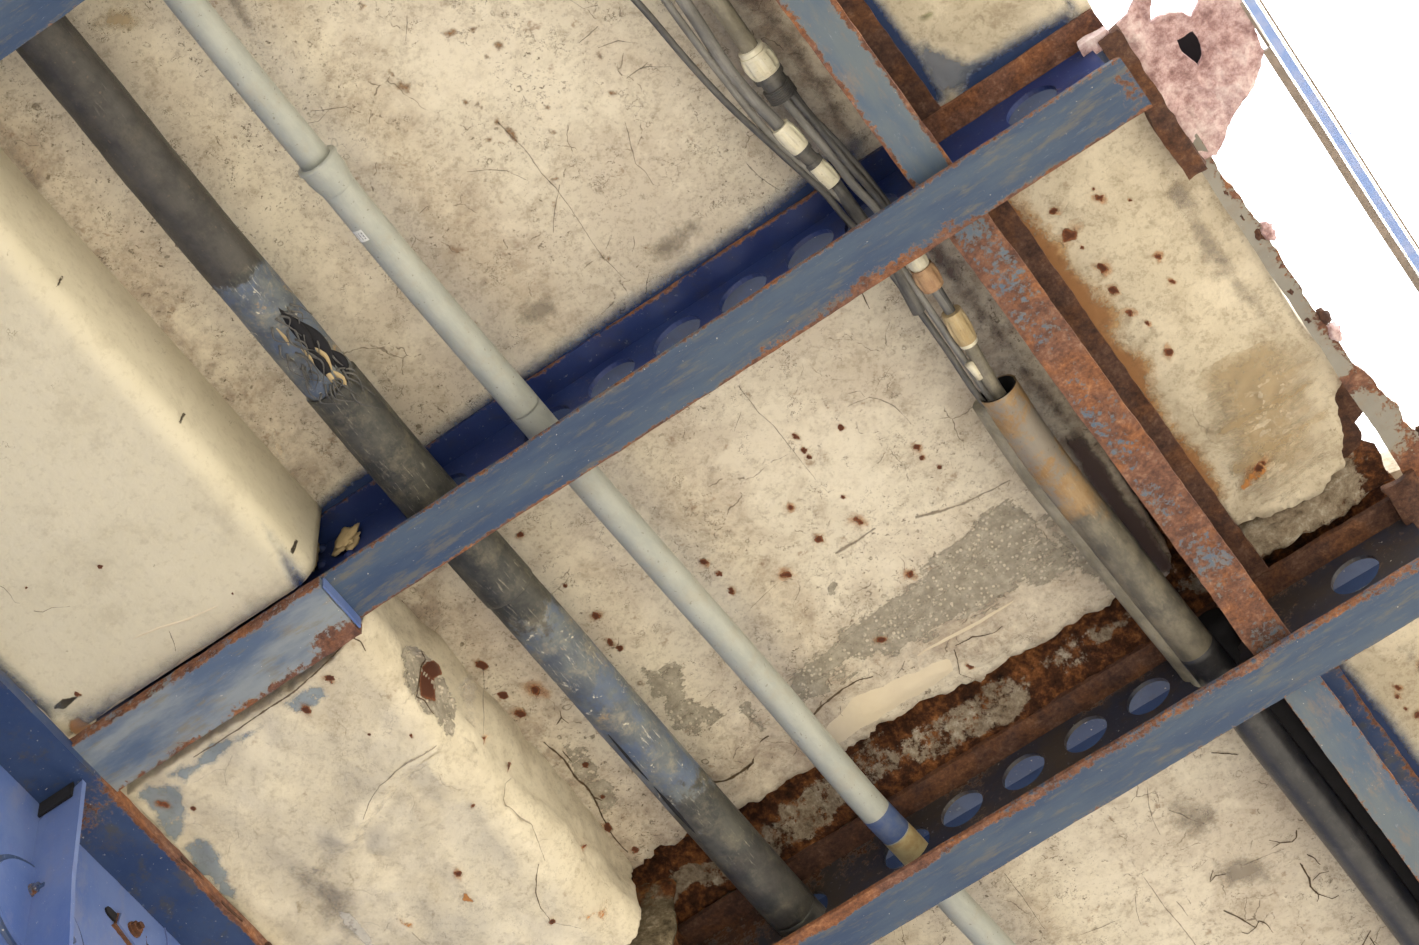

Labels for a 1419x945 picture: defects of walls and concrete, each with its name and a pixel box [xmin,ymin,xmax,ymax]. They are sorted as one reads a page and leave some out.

rust [1008,196,1222,497]
rust [1067,437,1175,572]
rust [1241,459,1266,490]
spalling [1238,440,1395,567]
spalling [1138,497,1214,613]
spalling [401,646,457,736]
rust [497,692,526,718]
rust [526,684,546,696]
peeling [641,662,765,735]
spalling [789,498,1151,799]
spalling [738,767,859,861]
spalling [631,833,737,925]